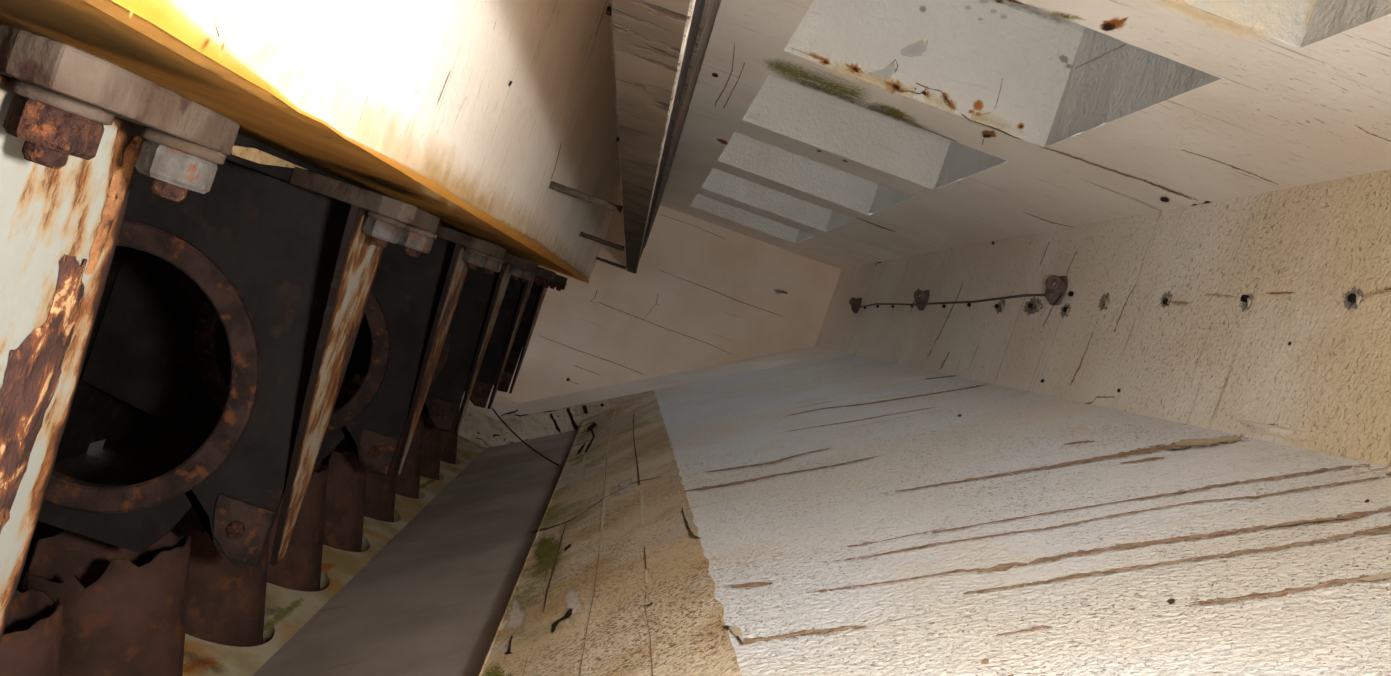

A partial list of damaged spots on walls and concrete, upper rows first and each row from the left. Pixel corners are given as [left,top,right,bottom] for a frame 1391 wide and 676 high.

corrosion [85,135,142,275]